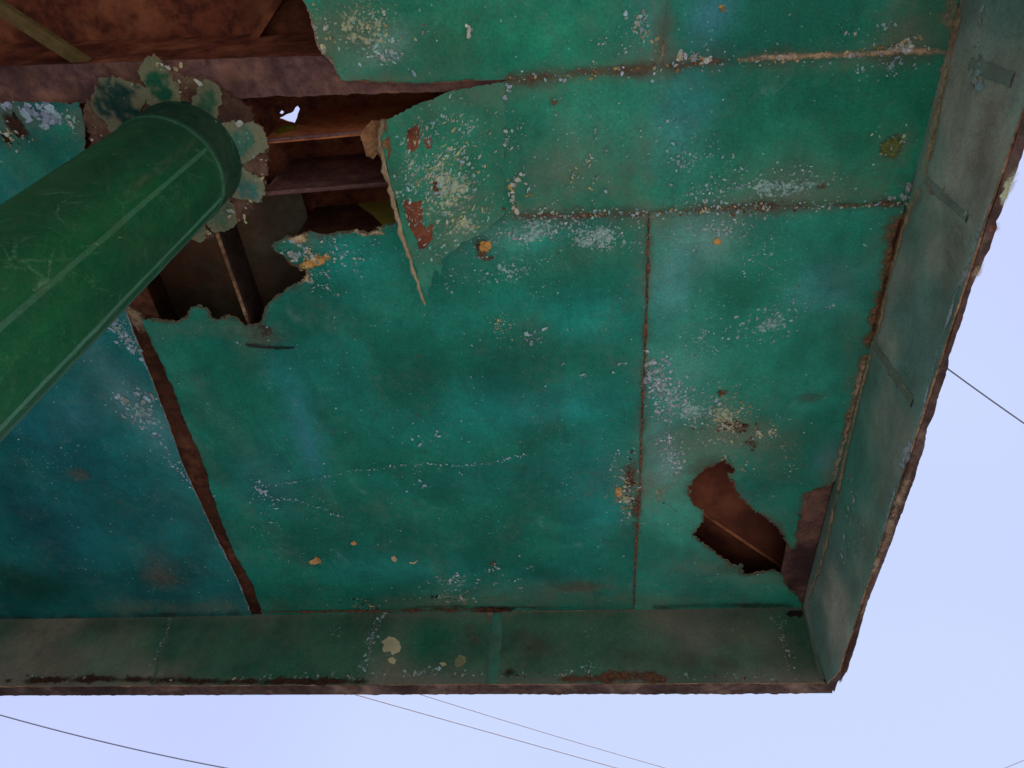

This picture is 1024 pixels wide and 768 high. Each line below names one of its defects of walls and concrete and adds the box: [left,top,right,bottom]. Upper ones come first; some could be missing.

peeling [155,62,203,93]
rust [746,0,960,174]
rust [407,124,433,152]
rust [1000,175,1016,205]
peeling [276,233,380,297]
rust [687,188,938,601]
rust [126,254,542,618]
rust [615,450,641,529]
rust [25,674,366,687]
peeling [221,599,484,685]
rust [561,670,667,684]
rust [840,604,864,681]